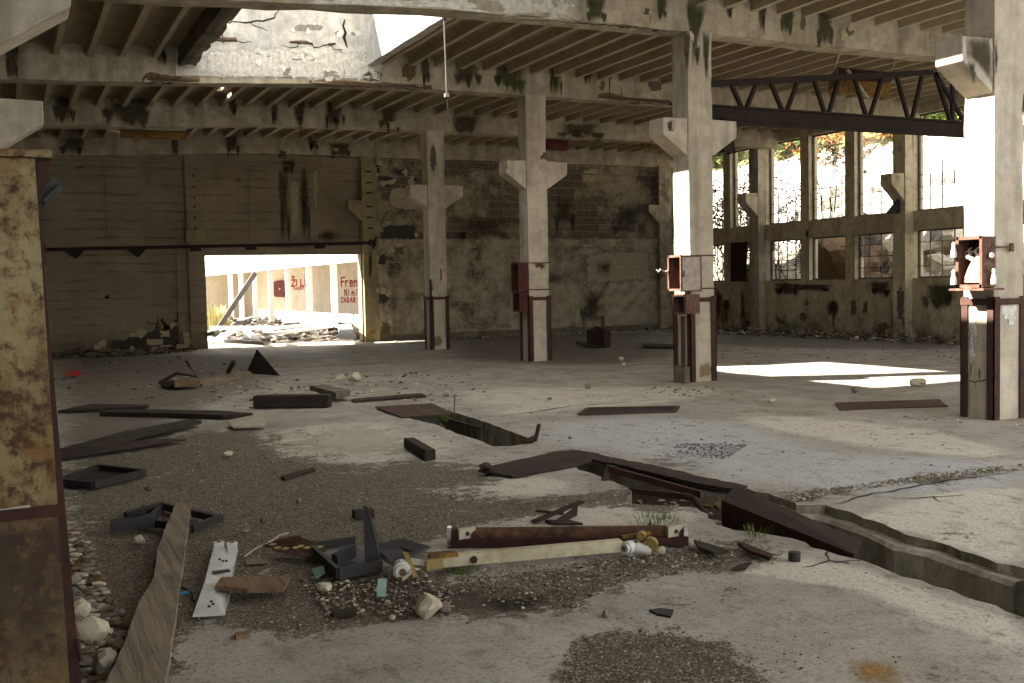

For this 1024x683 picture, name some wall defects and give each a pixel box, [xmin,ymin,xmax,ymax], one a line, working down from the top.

crack [228,10,348,76]
peeling [282,22,361,79]
damp [684,33,709,74]
damp [817,12,834,46]
damp [455,64,526,92]
peeling [376,160,417,187]
damp [278,150,334,241]
peeling [376,221,418,269]
damp [930,285,955,309]
peeling [94,322,191,351]
crack [836,470,1024,504]
crack [805,551,869,567]